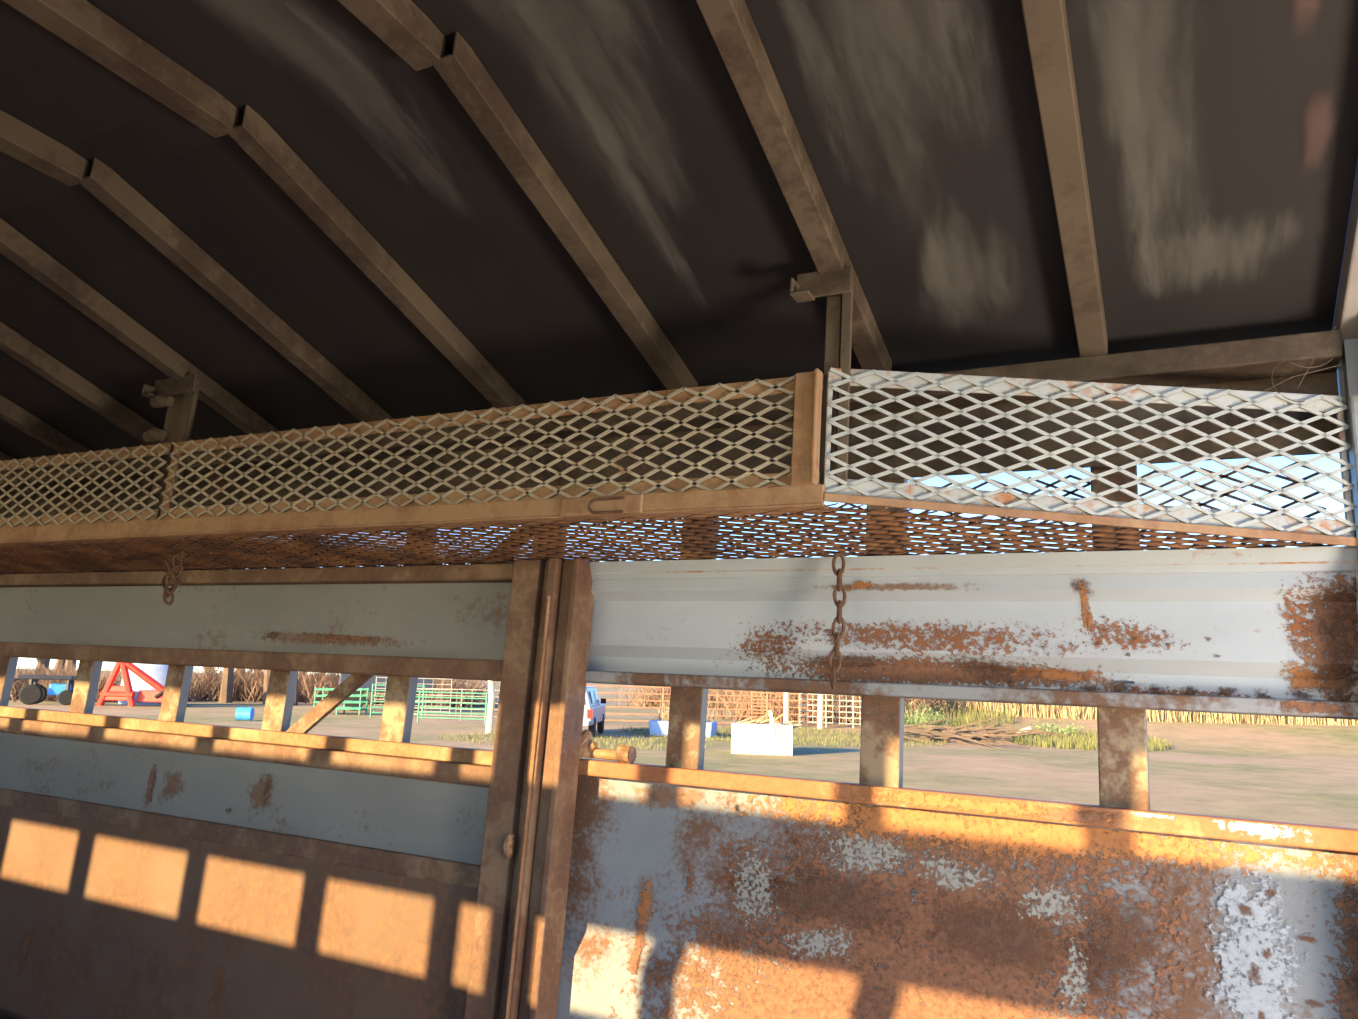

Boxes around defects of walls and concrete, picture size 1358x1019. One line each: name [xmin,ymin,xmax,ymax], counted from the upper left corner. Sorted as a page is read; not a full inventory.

corrosion [267,632,391,646]
corrosion [729,572,1358,716]
corrosion [608,785,1358,1019]